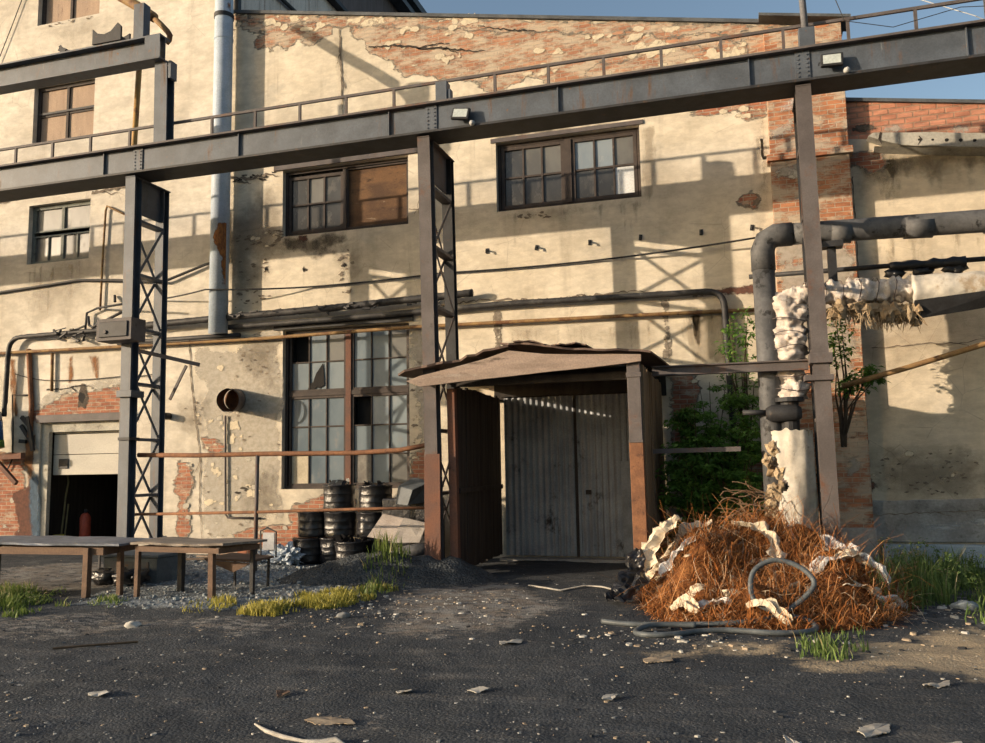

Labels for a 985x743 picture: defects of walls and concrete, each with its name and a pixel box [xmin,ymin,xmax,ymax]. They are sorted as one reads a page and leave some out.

crack [337,29,346,114]
flaking render [233,13,786,92]
flaking render [736,190,762,211]
rust [213,223,227,284]
water stain [287,234,354,294]
peeling [661,299,672,359]
flaking render [28,380,120,422]
flaking render [666,375,703,442]
peeling [172,327,324,555]
flaking render [0,451,26,547]
flaking render [735,446,764,505]